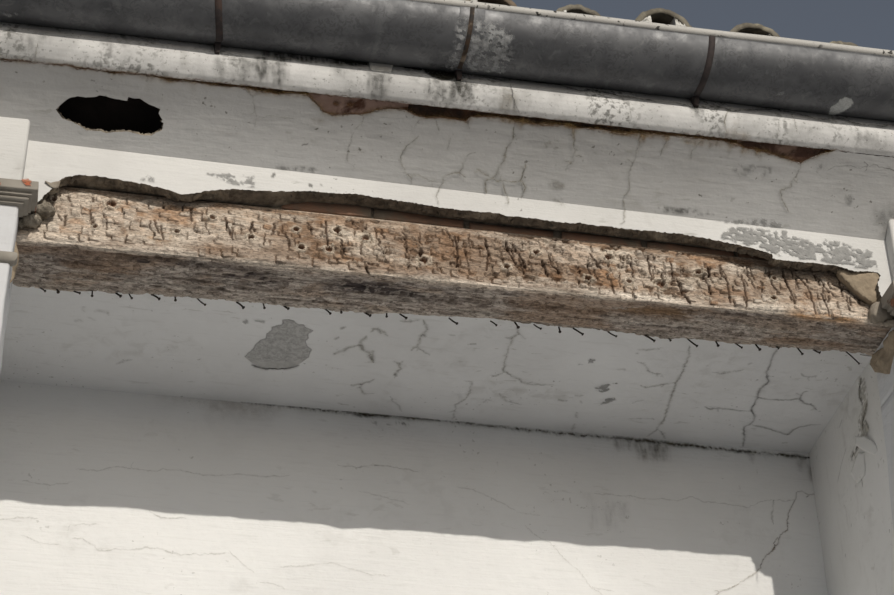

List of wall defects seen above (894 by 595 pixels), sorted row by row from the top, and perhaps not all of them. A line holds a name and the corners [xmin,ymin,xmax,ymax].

spalling [58,95,163,134]
crack [1,58,887,210]
spalling [78,67,894,163]
spalling [31,173,894,374]